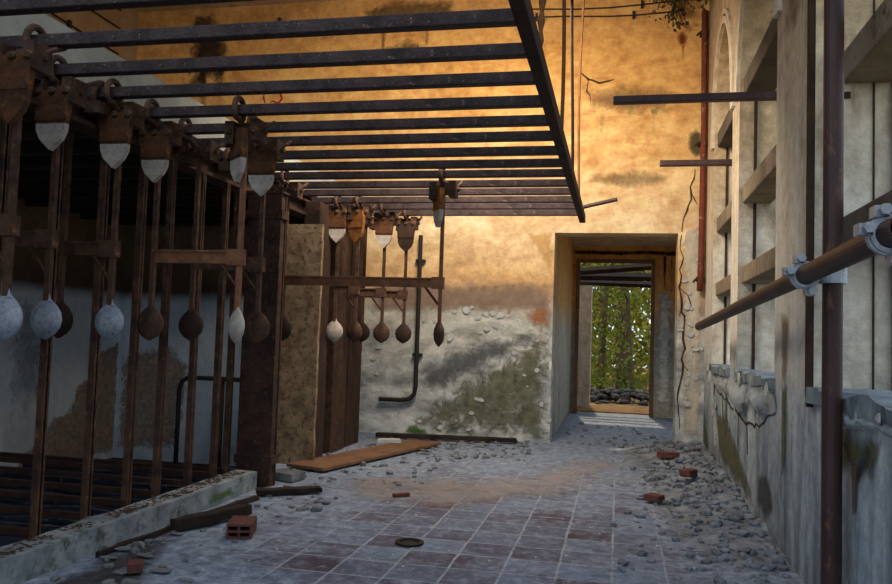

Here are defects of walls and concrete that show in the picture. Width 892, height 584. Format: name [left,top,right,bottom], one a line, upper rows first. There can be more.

water stain [195,42,226,57]
crack [676,169,697,430]
flaking render [46,343,186,457]
water stain [417,334,551,441]
water stain [717,394,750,494]
crack [713,385,775,455]